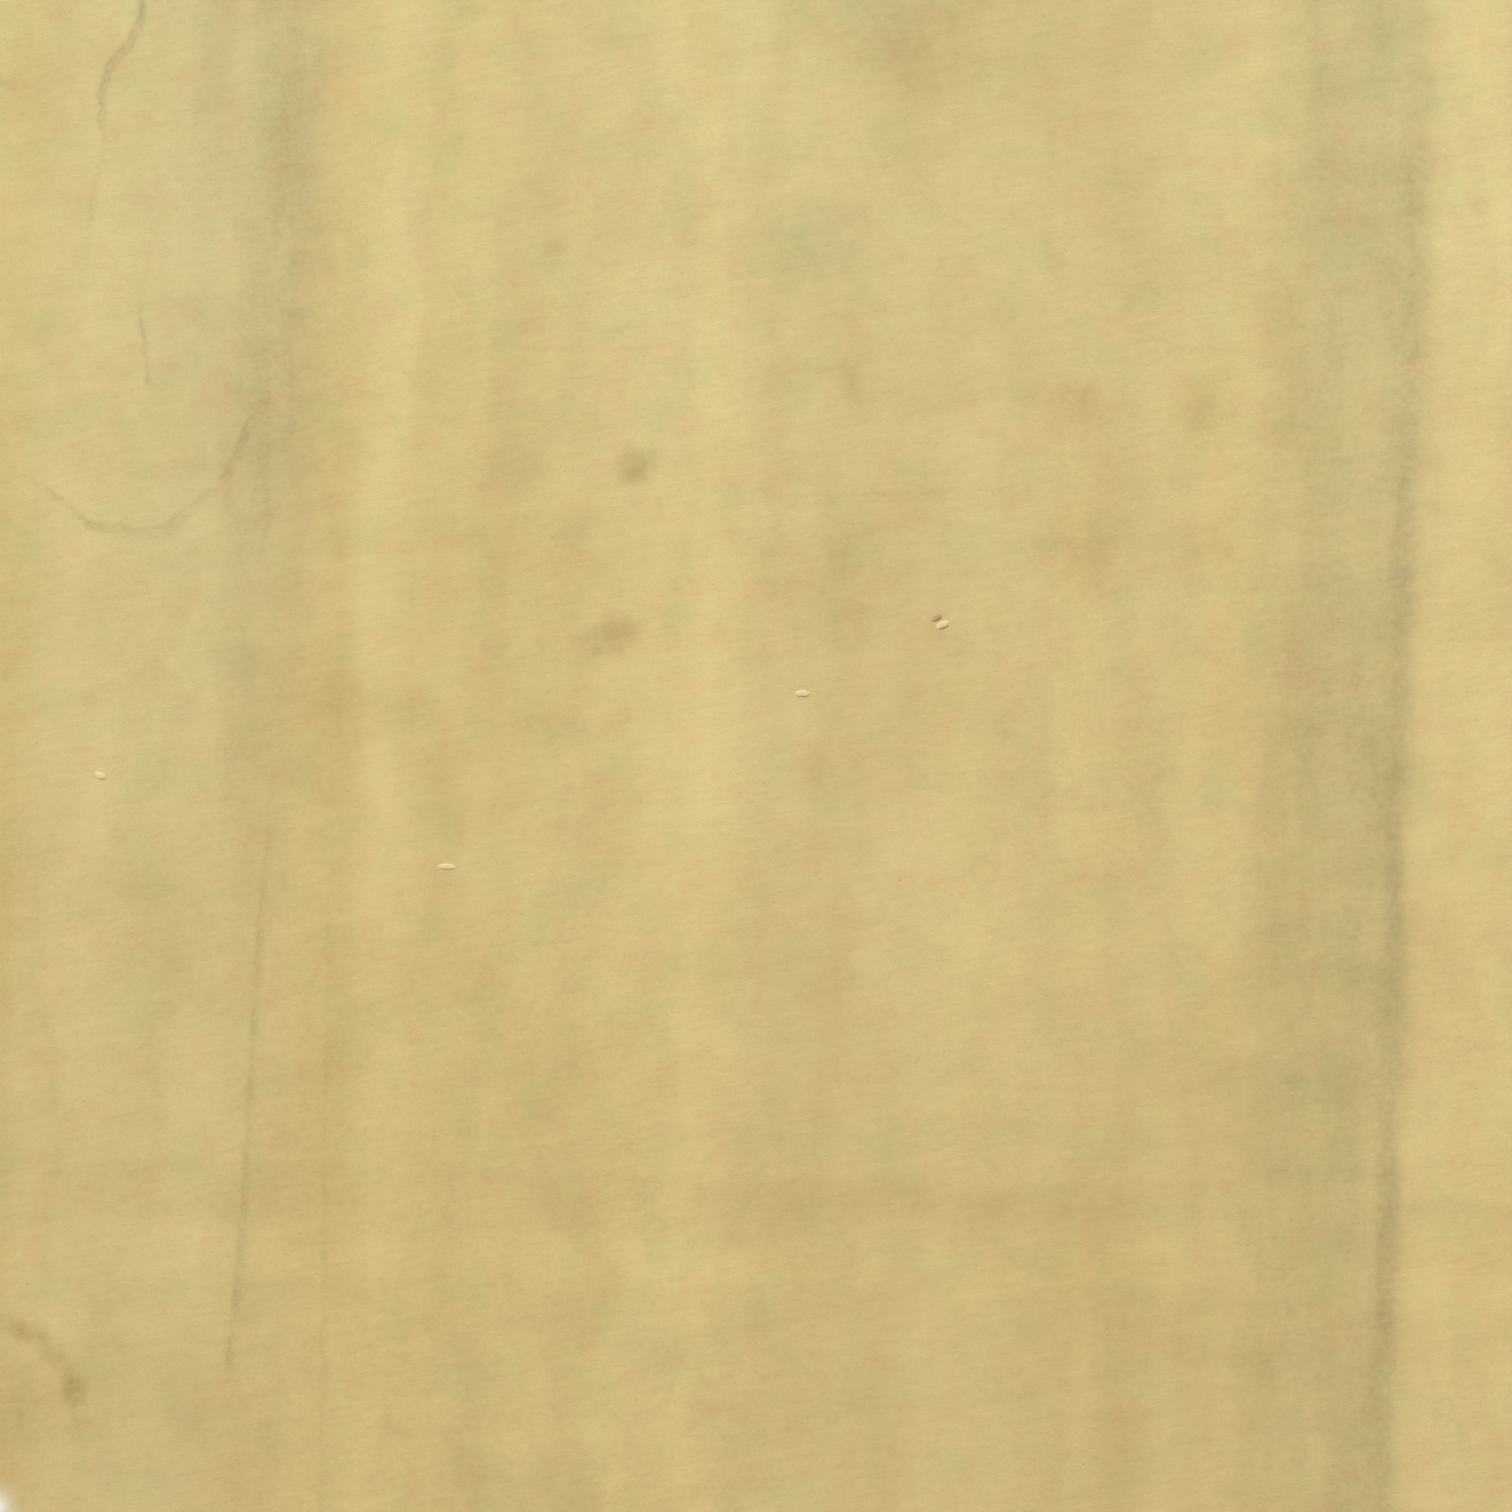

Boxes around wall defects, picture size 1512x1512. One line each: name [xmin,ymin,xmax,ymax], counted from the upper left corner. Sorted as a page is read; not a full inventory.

flaking render [0,1475,25,1512]